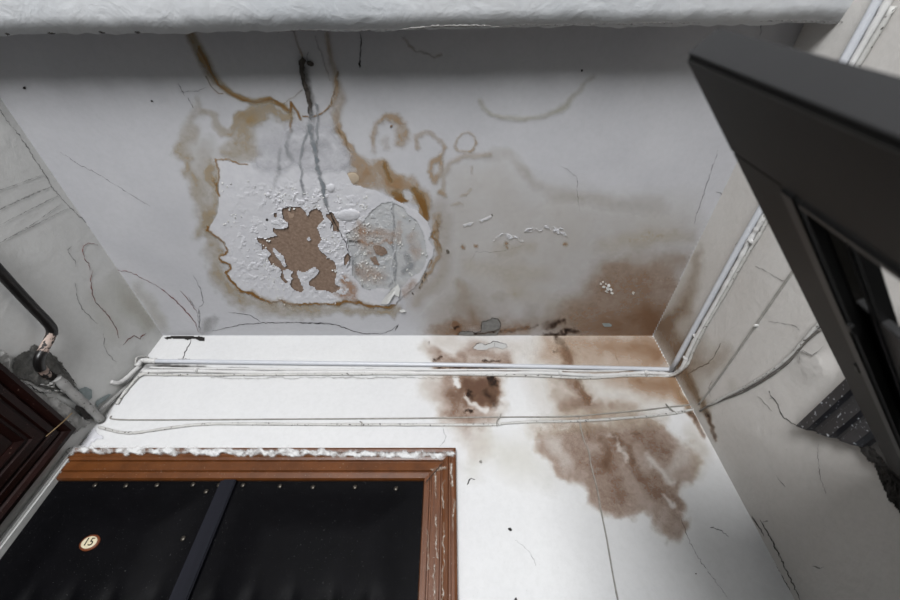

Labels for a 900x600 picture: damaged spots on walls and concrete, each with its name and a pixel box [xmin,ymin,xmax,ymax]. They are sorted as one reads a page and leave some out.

water stain [372,113,408,145]
water stain [175,32,400,315]
peeling [209,127,434,312]
crack [325,204,358,267]
water stain [334,122,446,295]
crack [69,243,145,360]
crack [121,271,398,359]
water stain [434,314,481,335]
water stain [497,323,530,335]
water stain [433,344,521,423]
water stain [538,262,698,537]
crack [752,517,800,600]